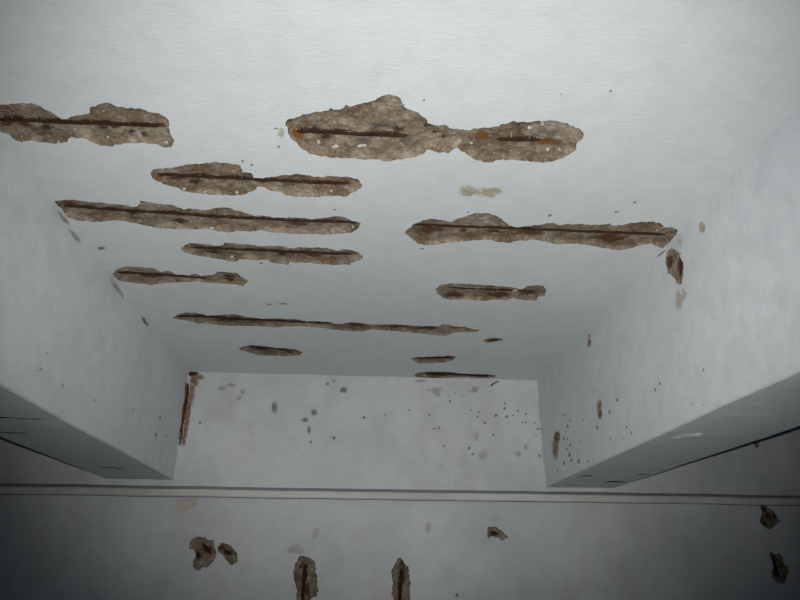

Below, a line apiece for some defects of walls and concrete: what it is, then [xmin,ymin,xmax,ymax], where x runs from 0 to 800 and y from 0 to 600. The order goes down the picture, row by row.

spalling [0,103,174,147]
spalling [285,94,584,163]
spalling [151,162,362,197]
spalling [55,200,361,235]
spalling [181,243,363,265]
spalling [405,213,684,285]
spalling [112,266,248,286]
spalling [436,283,547,301]
spalling [173,312,479,336]
spalling [189,537,237,570]
spalling [293,556,318,600]
spalling [391,558,411,600]